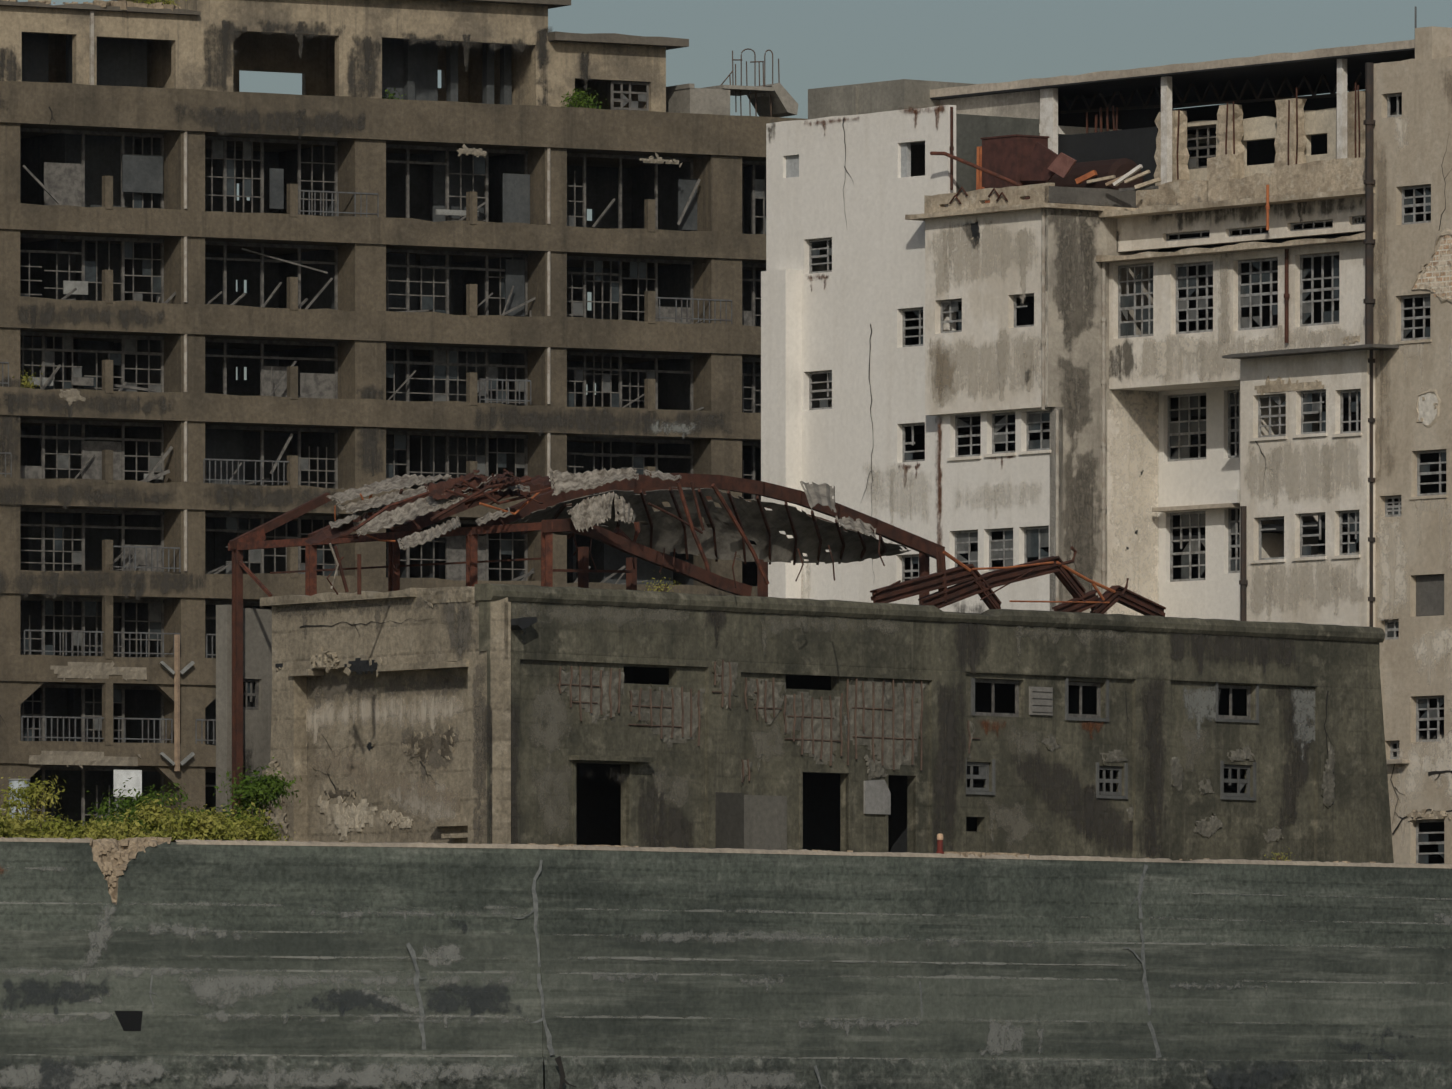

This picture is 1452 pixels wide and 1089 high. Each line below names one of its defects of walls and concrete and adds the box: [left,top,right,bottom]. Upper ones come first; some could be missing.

crack [1439,136,1452,230]
flaking render [1411,228,1452,304]
damp [1109,340,1137,378]
damp [1049,203,1109,598]
flaking render [1416,389,1441,428]
rust [899,420,942,545]
spalling [401,725,455,761]
spalling [557,658,926,780]
flaking render [317,784,414,840]
peeling [84,837,172,890]
crack [512,860,576,1089]